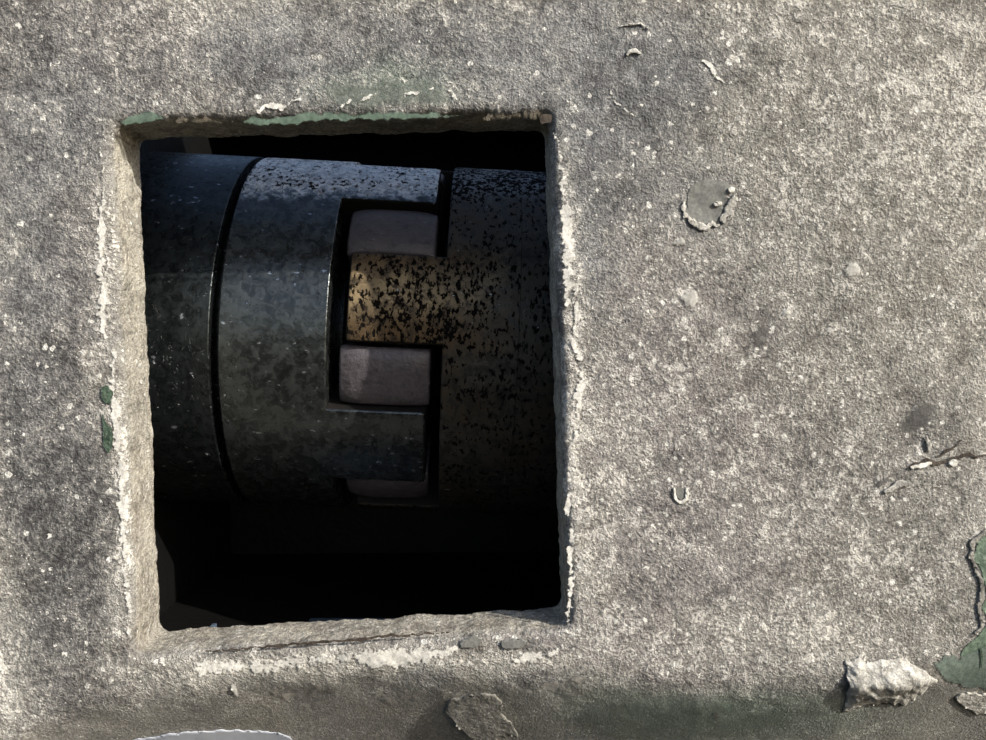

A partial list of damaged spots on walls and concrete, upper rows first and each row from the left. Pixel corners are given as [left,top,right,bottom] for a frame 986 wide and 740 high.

peeling [680,179,737,231]
crack [869,436,986,494]
peeling [843,530,986,715]